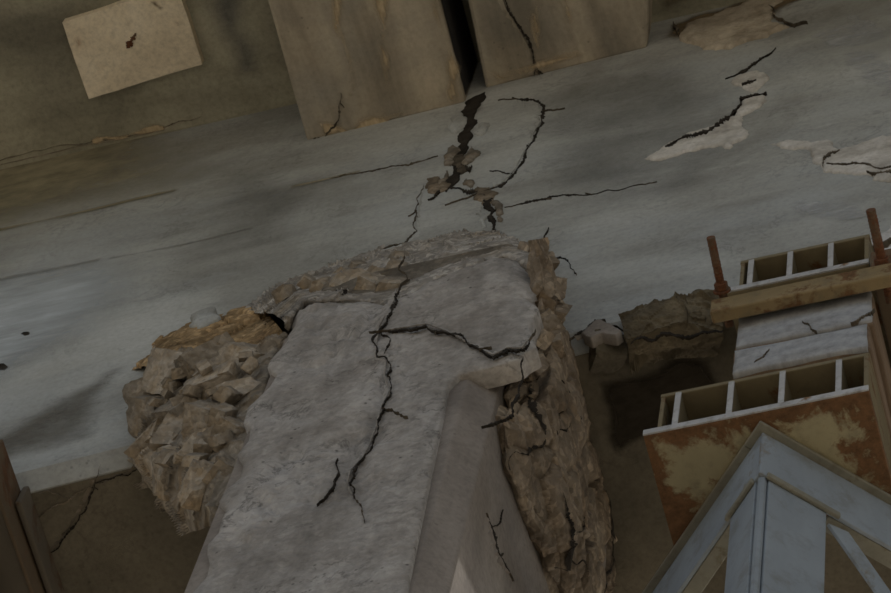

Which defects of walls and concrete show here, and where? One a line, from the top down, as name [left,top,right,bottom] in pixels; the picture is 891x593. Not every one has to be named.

crack [498,0,543,76]
spalling [673,0,808,51]
spalling [645,47,776,161]
peeling [770,135,891,183]
spalling [871,226,891,252]
crack [314,92,657,524]
spalling [122,228,530,536]
crack [39,465,137,553]
crack [486,509,514,582]
crack [554,471,616,593]